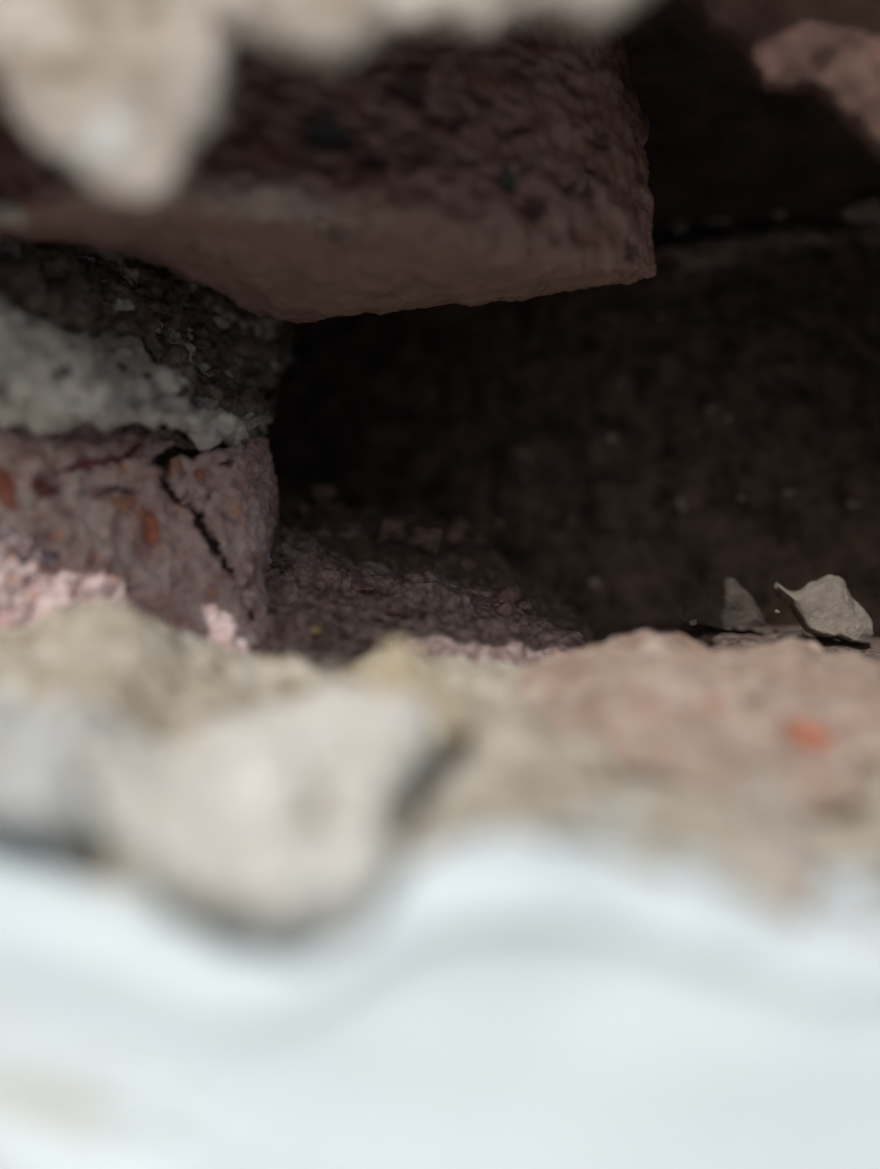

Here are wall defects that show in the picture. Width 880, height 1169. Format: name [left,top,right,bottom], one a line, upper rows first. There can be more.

peeling [0,0,653,207]
spalling [0,526,61,570]
crack [153,444,256,621]
spalling [682,577,780,631]
spalling [0,596,880,941]